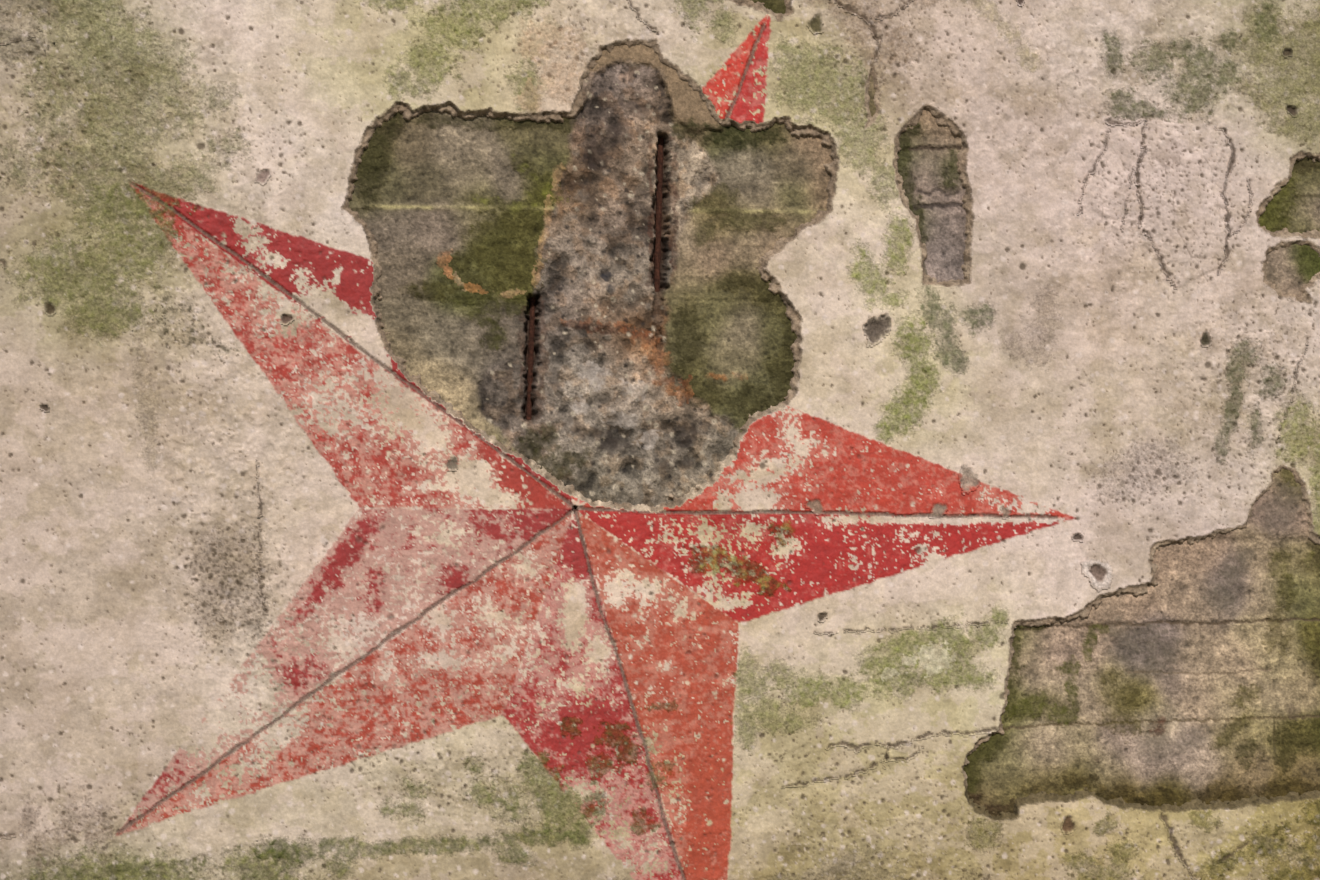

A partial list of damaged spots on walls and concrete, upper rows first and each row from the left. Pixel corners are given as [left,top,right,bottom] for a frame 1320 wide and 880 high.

spalling [341,37,840,515]
corrosion [436,162,749,436]
corrosion [645,135,681,302]
spalling [892,103,975,289]
crack [1077,117,1178,289]
crack [1214,126,1255,275]
spalling [1255,150,1320,304]
spalling [959,463,1320,823]
crack [781,727,999,789]